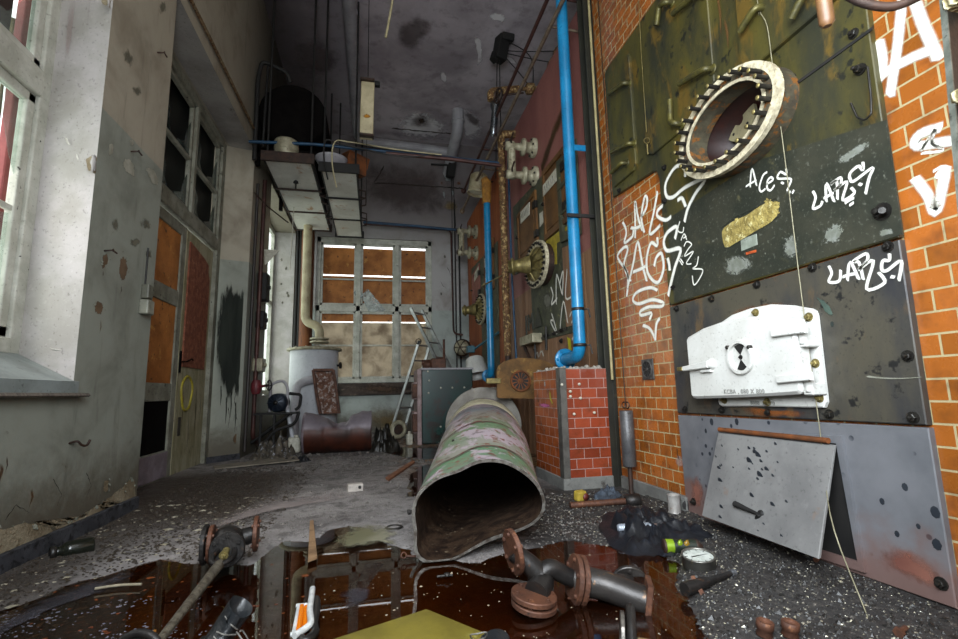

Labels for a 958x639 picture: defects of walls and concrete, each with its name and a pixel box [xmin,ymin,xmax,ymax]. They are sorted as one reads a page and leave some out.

flaking render [0,477,137,554]